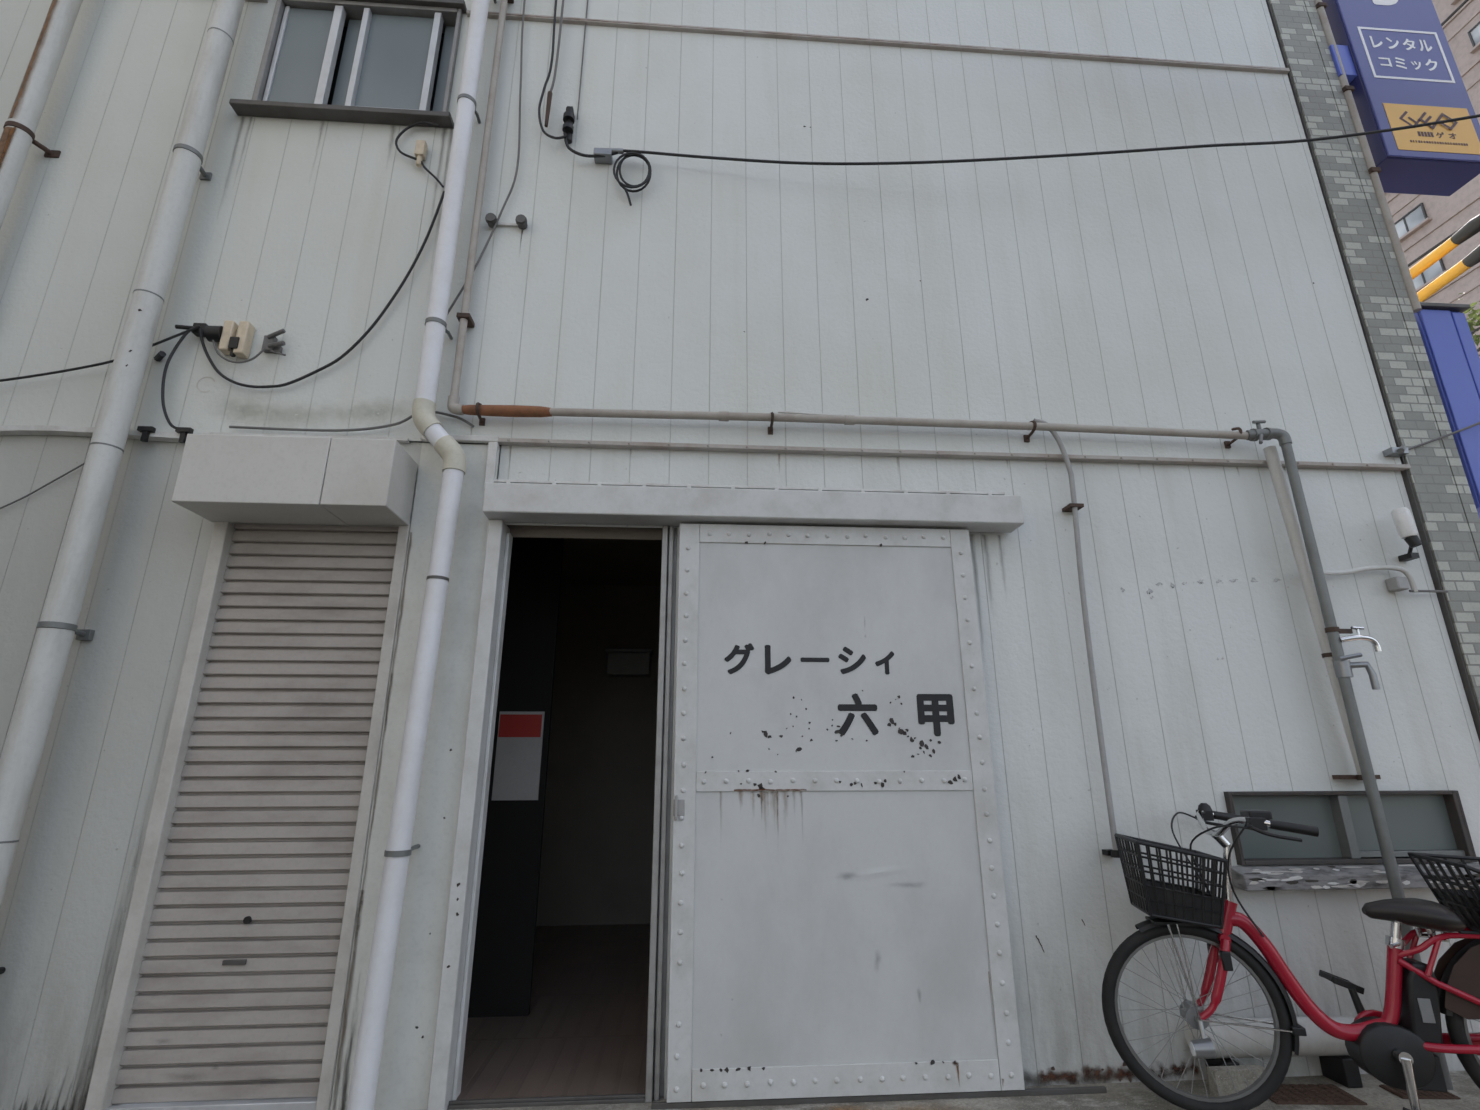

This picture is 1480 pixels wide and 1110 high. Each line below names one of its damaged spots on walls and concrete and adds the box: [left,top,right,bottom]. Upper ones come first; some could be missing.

corrosion [0,0,57,167]
corrosion [734,789,806,812]